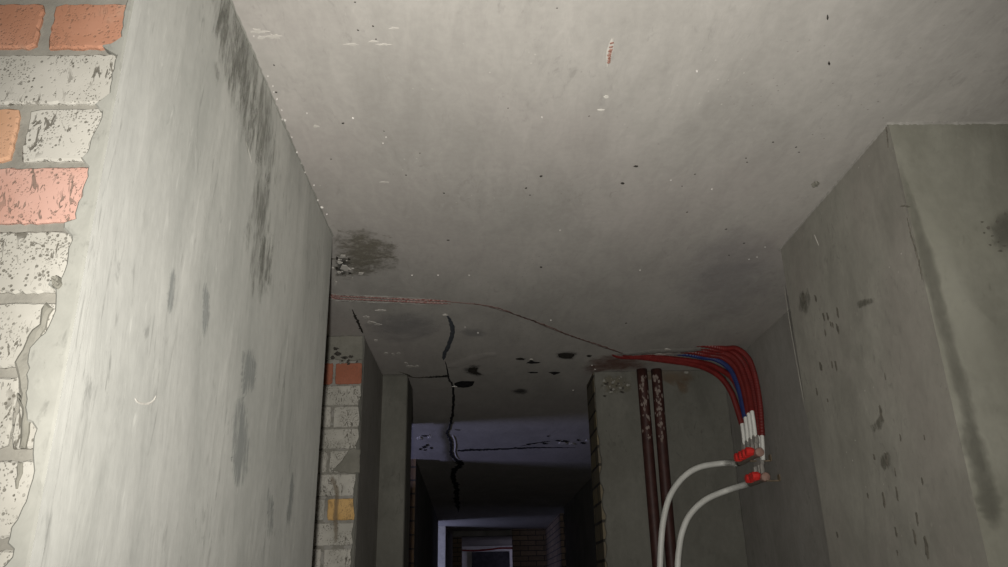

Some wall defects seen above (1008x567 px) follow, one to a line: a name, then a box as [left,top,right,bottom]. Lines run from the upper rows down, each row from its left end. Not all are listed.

crack [329,294,634,512]